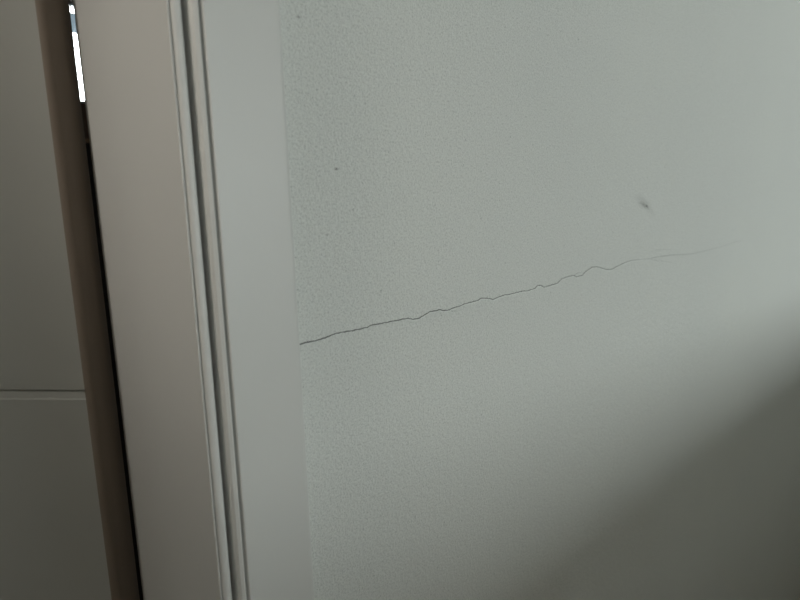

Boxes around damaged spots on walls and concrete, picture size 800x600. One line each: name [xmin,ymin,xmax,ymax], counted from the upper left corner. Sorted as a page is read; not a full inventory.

crack [300,241,738,345]